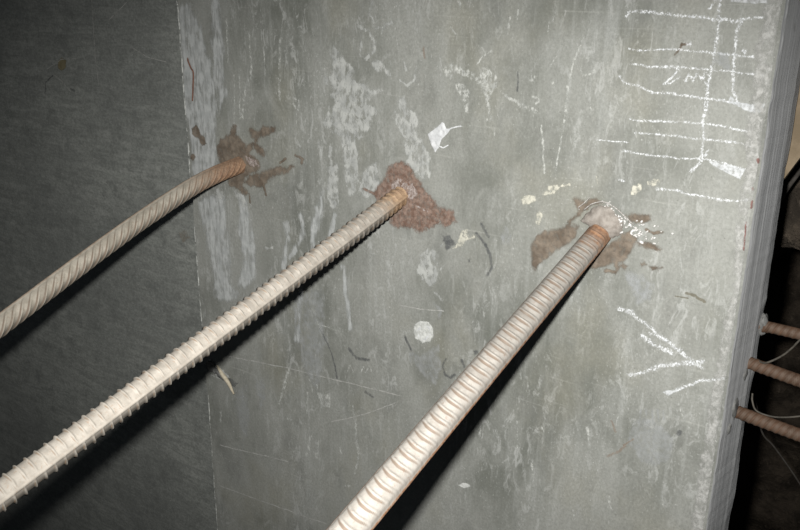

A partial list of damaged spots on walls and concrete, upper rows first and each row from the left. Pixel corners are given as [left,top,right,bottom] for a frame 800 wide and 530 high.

rust [192,125,206,146]
rust [217,125,304,203]
rust [363,161,455,232]
rust [531,199,598,268]
rust [588,214,663,273]